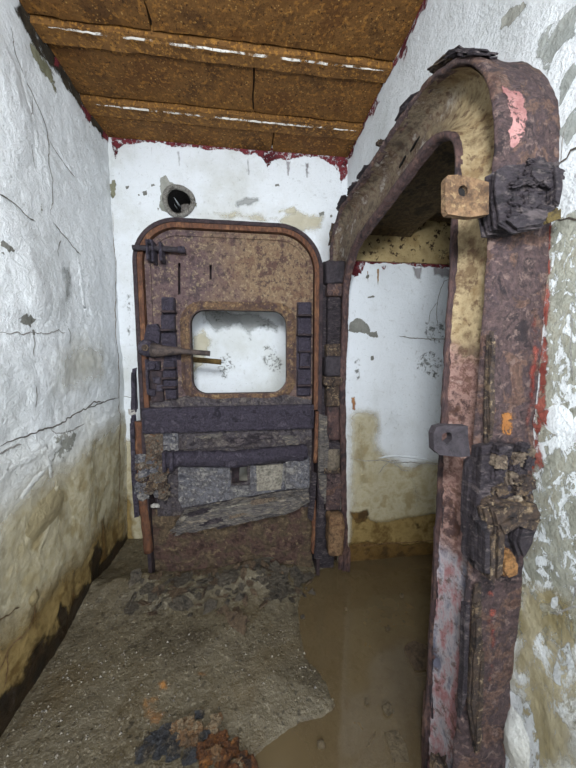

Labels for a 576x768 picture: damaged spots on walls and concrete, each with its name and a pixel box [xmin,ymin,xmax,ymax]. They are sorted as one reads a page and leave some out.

peeling [500,2,526,29]
peeling [536,6,576,71]
peeling [111,0,427,181]
peeling [559,63,576,105]
peeling [560,108,576,145]
crack [3,326,71,355]
crack [112,237,120,370]
spalling [348,318,378,338]
peeling [521,211,576,649]
water stain [349,413,438,561]
water stain [0,422,143,737]